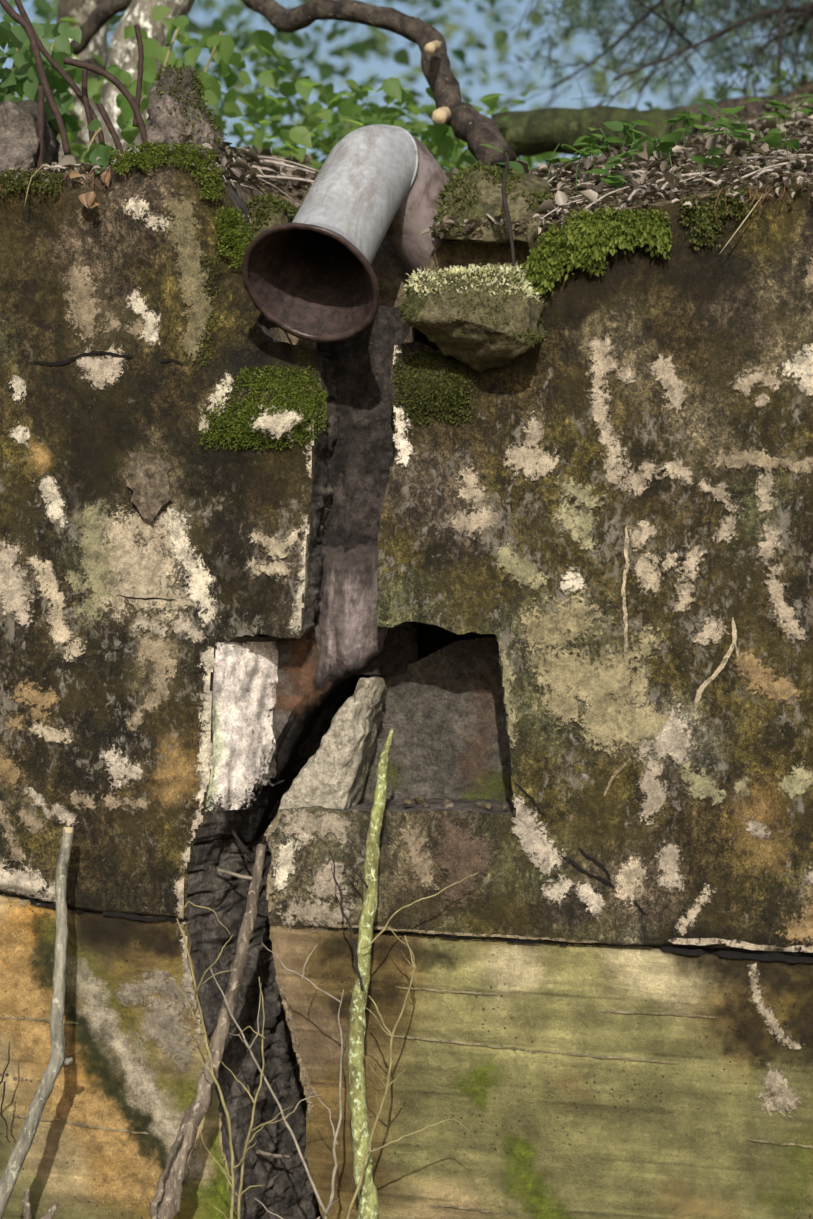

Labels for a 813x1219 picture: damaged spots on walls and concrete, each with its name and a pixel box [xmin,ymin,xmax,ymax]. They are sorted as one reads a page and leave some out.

crack [301,353,340,636]
water stain [33,915,197,1172]
crack [0,772,323,1219]